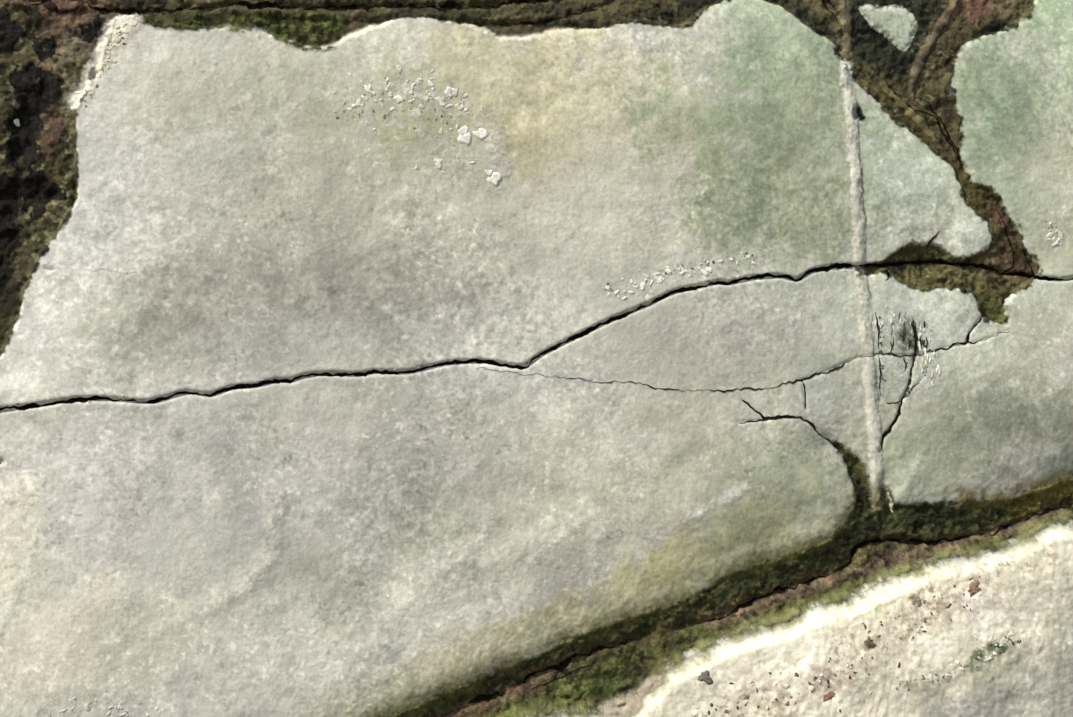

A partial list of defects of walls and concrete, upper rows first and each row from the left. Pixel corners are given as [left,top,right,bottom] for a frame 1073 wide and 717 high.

crack [83,0,613,26]
crack [0,210,1073,451]